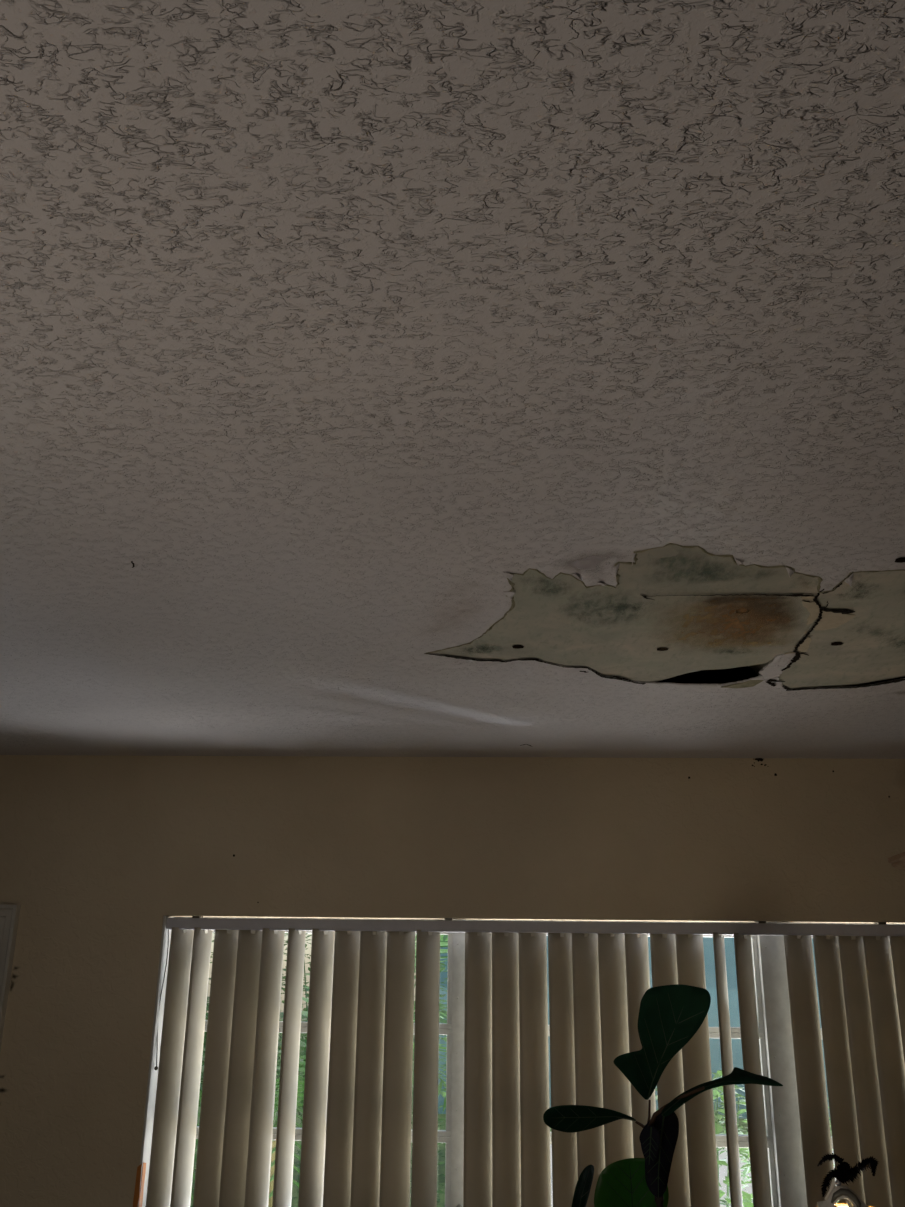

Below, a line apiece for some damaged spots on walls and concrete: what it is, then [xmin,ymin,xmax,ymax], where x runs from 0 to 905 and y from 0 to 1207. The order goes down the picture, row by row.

peeling [425,543,905,688]
crack [641,573,905,691]